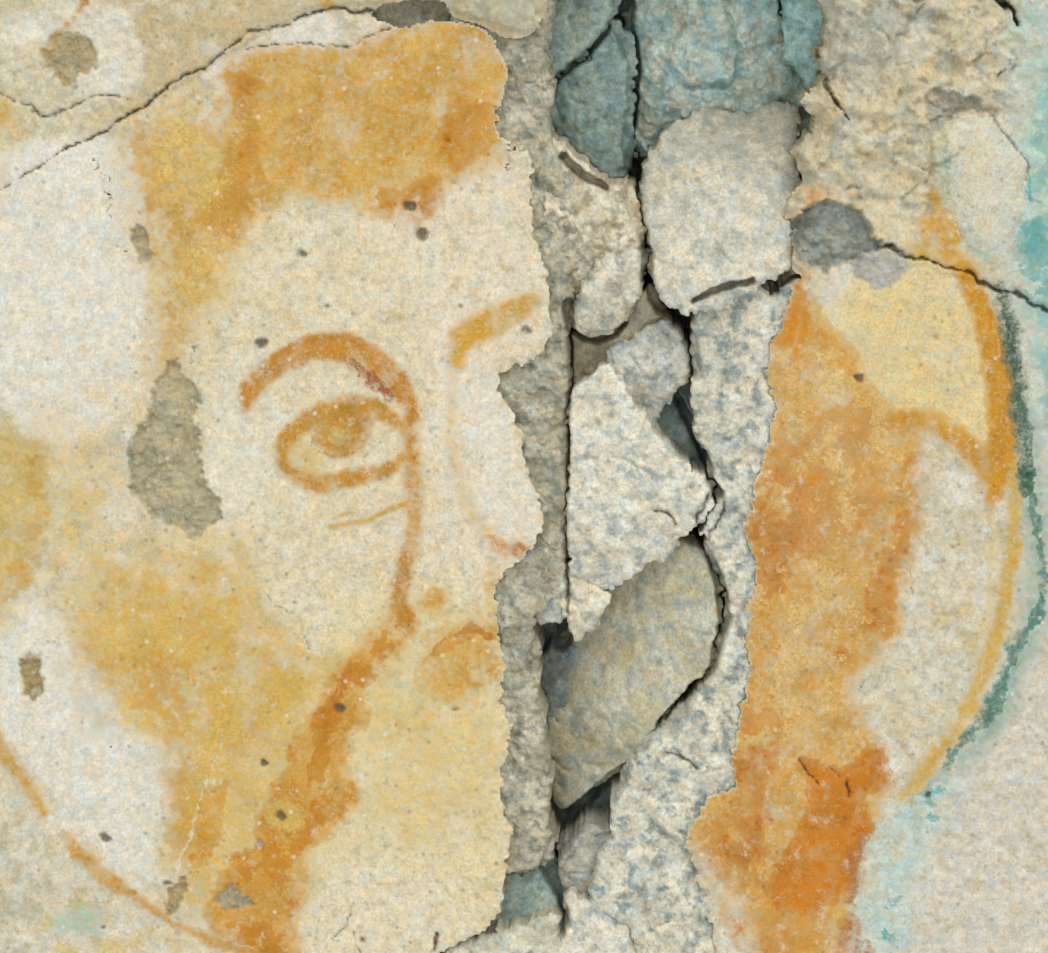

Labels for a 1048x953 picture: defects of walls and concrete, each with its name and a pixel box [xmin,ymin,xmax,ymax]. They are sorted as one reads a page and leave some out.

crack [994,0,1019,26]
crack [996,59,1013,79]
crack [887,244,1048,313]
spalling [519,323,534,336]
flaking render [124,358,224,541]
crack [0,0,801,953]
flaking render [17,650,47,703]